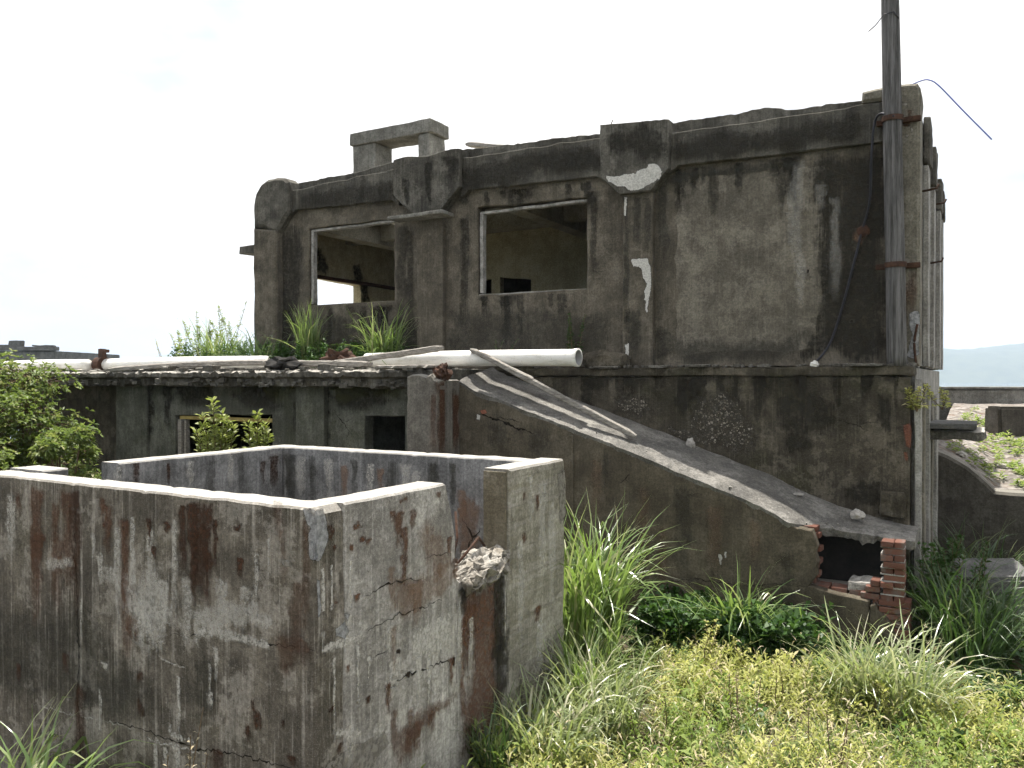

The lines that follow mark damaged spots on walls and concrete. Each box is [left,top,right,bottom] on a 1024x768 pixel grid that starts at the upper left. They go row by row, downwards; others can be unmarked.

peeling [606,164,662,216]
water stain [425,113,886,363]
peeling [631,258,651,312]
crack [480,413,534,434]
rust [16,490,76,600]
rust [100,498,138,641]
rust [146,502,218,599]
spalling [303,508,337,561]
crack [366,518,480,596]
crack [368,599,440,631]
crack [387,660,449,706]
rust [386,572,503,763]